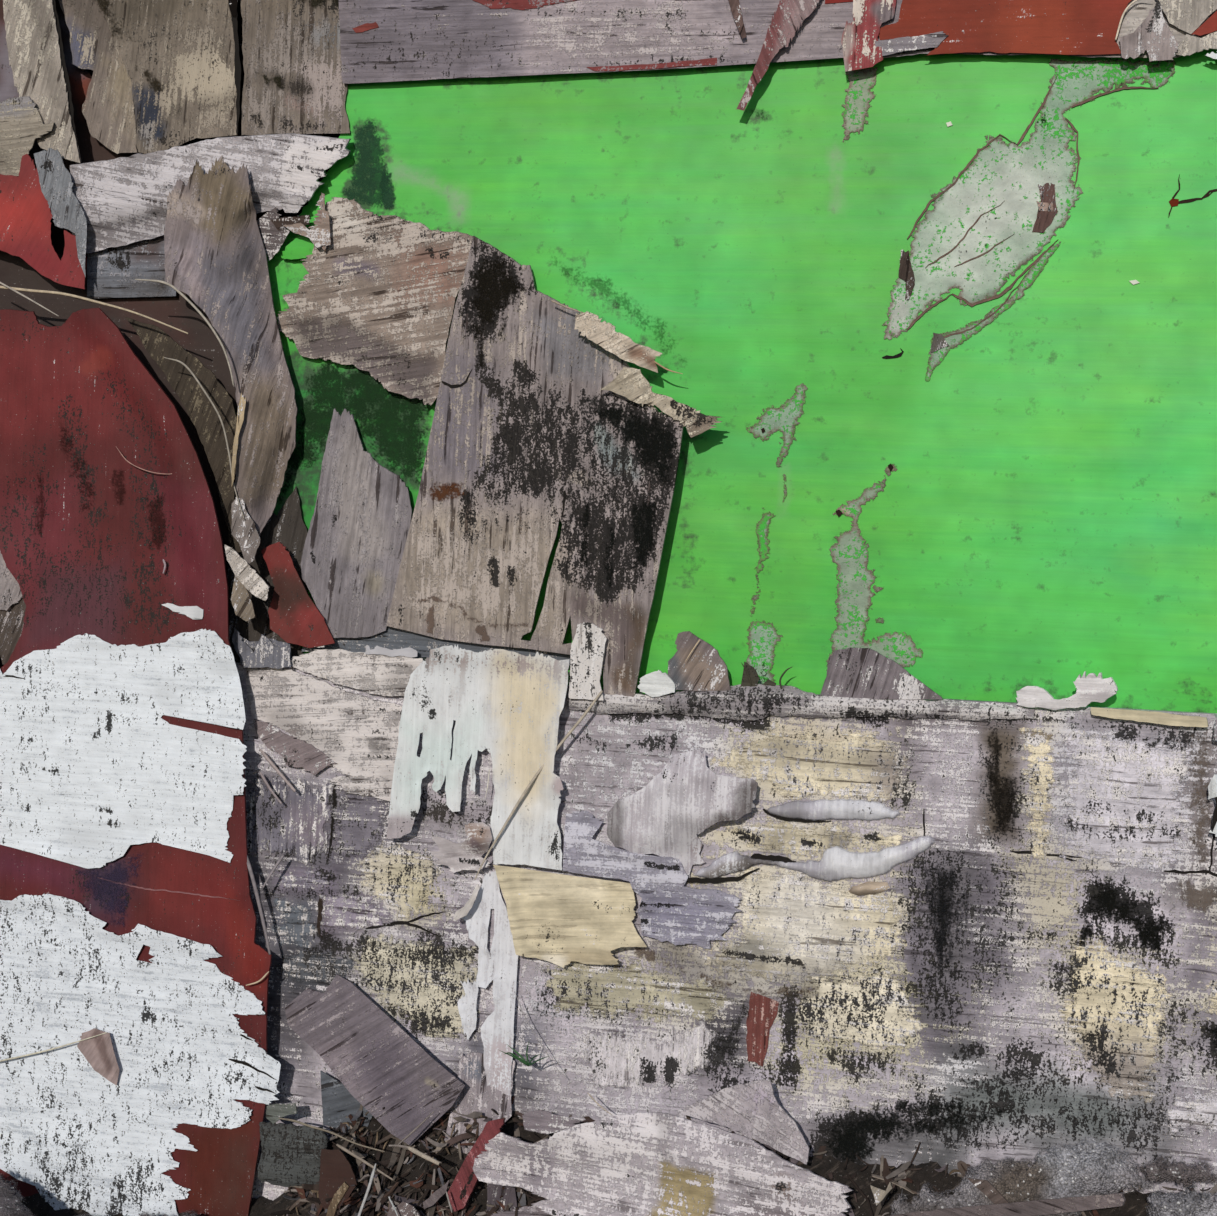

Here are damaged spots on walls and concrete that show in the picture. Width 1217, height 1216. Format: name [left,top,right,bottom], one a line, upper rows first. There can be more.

peeling [473,0,575,10]
peeling [882,0,1179,381]
water stain [470,259,524,366]
water stain [585,400,677,483]
peeling [746,383,808,502]
water stain [631,502,657,567]
peeling [746,508,783,684]
peeling [826,464,923,667]
peeling [254,719,337,775]
water stain [1189,736,1213,862]
water stain [1070,882,1167,964]
water stain [827,1100,1002,1162]